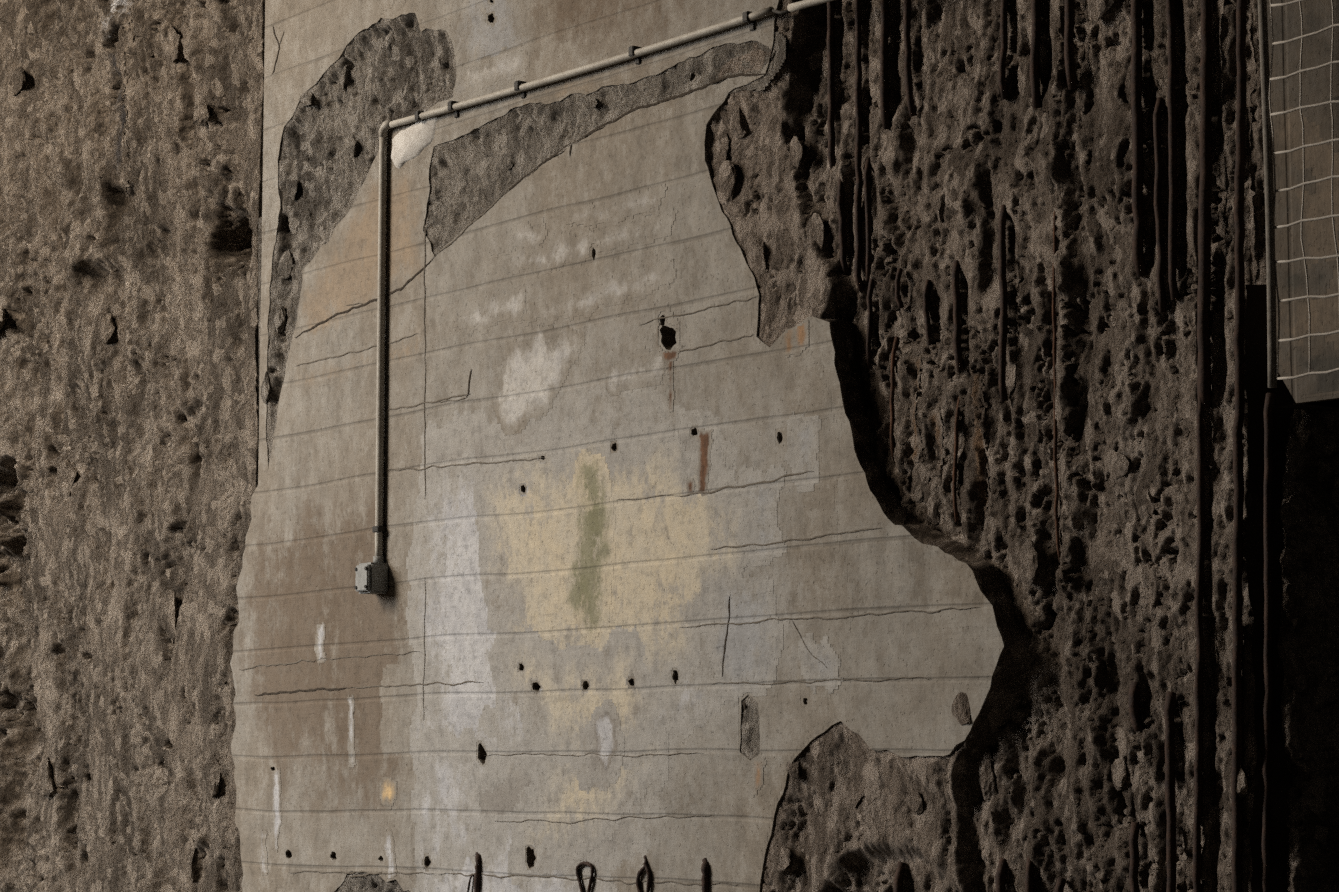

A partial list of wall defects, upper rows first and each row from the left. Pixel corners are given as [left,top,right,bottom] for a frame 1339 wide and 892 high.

water stain [96,0,135,197]
spalling [0,0,456,892]
water stain [232,159,858,892]
water stain [557,100,677,173]
rust [686,428,713,496]
spalling [423,0,1339,892]